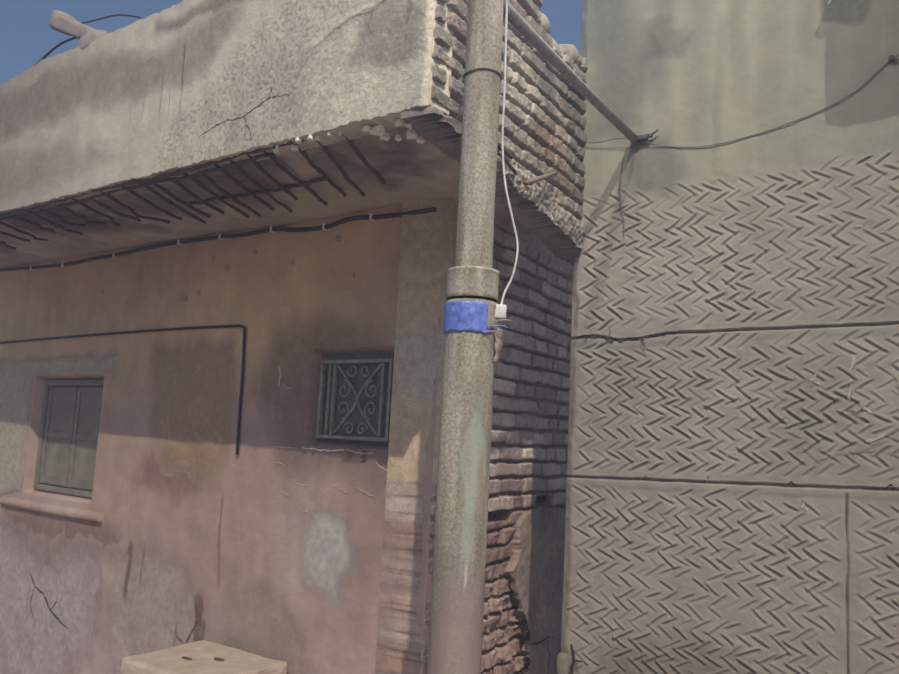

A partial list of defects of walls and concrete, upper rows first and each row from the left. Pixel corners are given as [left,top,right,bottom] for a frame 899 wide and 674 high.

crack [200,80,291,141]
spalling [497,144,517,174]
crack [30,574,68,628]
peeling [0,525,100,674]
peeling [105,542,205,674]
crack [504,575,588,674]